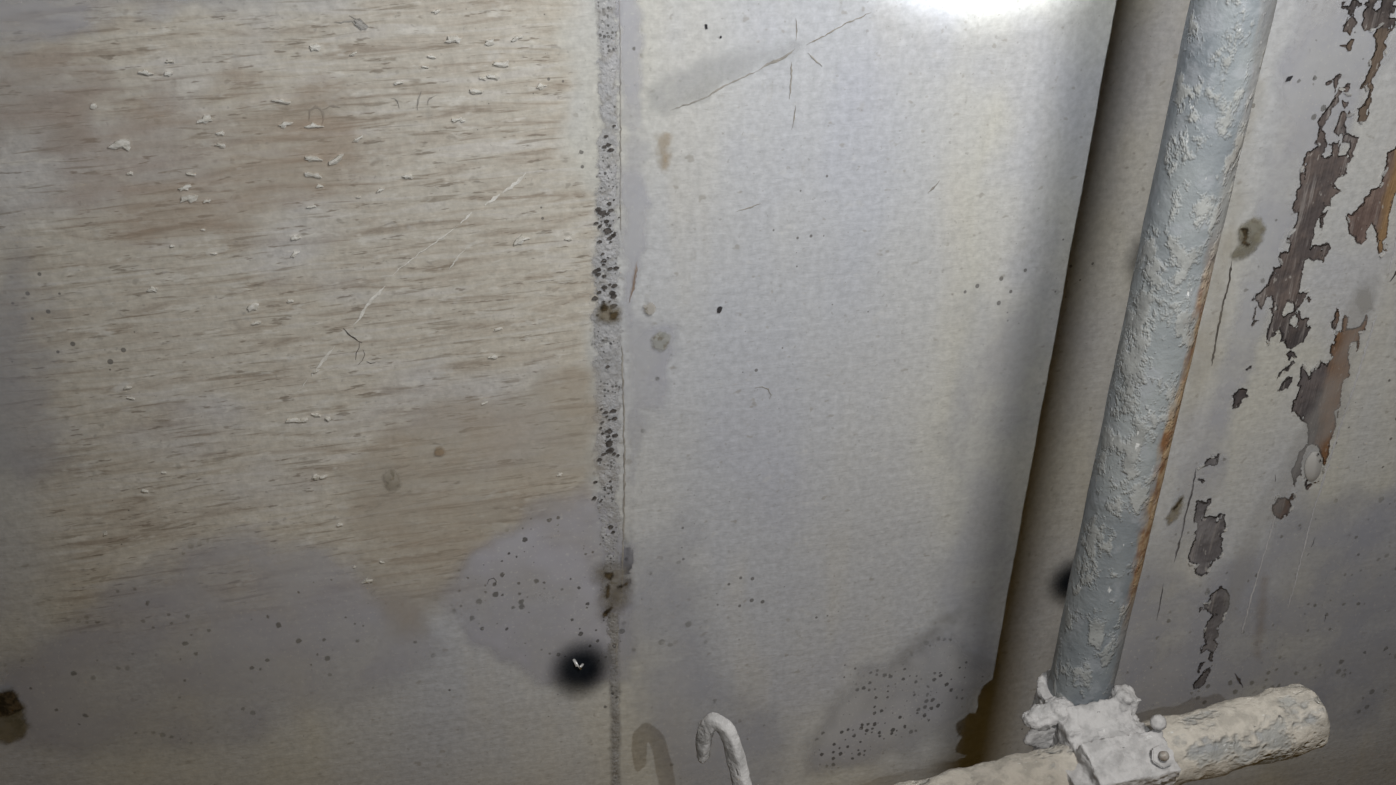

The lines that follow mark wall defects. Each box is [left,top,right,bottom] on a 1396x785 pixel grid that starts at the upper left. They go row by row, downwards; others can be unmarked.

spalling [1233,218,1266,258]
peeling [1251,0,1396,519]
peeling [1231,388,1249,409]
peeling [1167,453,1226,576]
leakage [462,502,630,680]
peeling [1193,585,1230,689]
leakage [811,640,985,769]